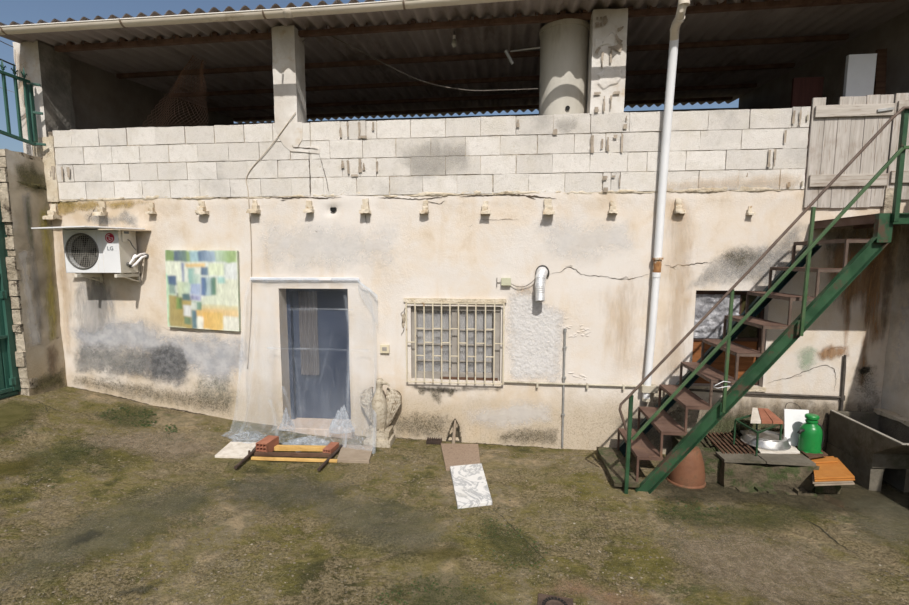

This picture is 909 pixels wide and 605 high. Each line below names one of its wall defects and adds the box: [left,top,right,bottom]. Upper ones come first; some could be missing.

corrosion [831,230,872,279]
corrosion [841,243,893,385]
leakage [77,285,242,411]
corrosion [821,347,846,359]
leakage [416,386,471,400]